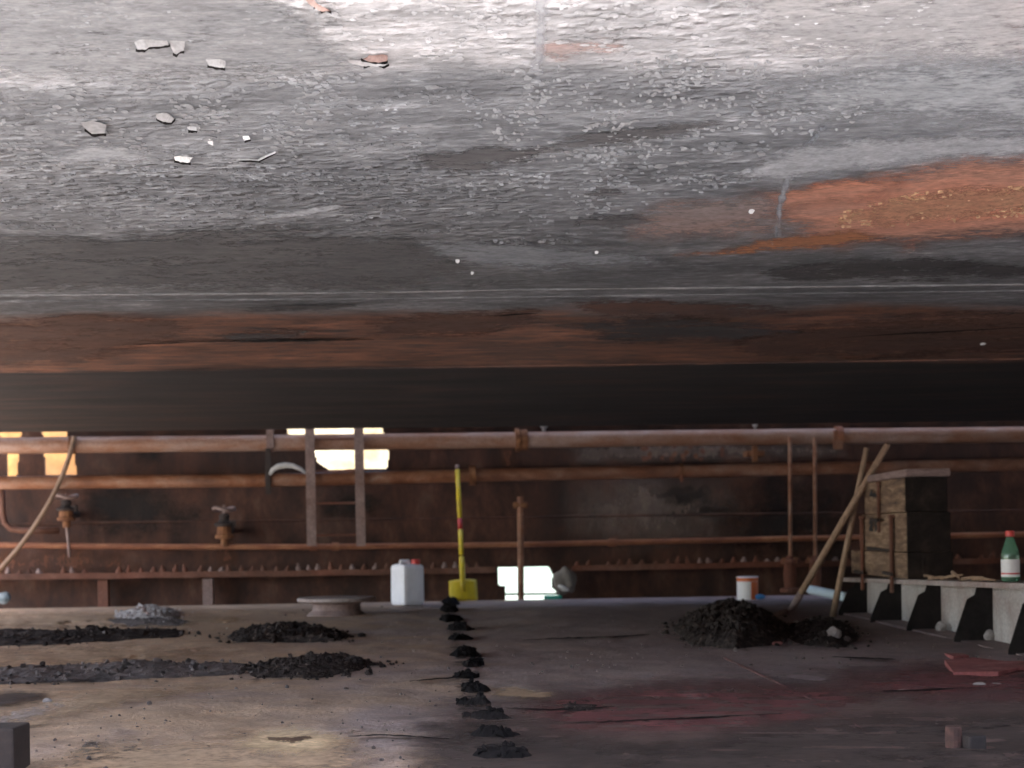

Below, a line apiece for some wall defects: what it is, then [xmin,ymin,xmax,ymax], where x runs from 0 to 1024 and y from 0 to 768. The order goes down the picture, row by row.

peeling [0,0,1024,246]
damp [418,122,720,173]
corrosion [630,159,1024,254]
corrosion [573,299,800,319]